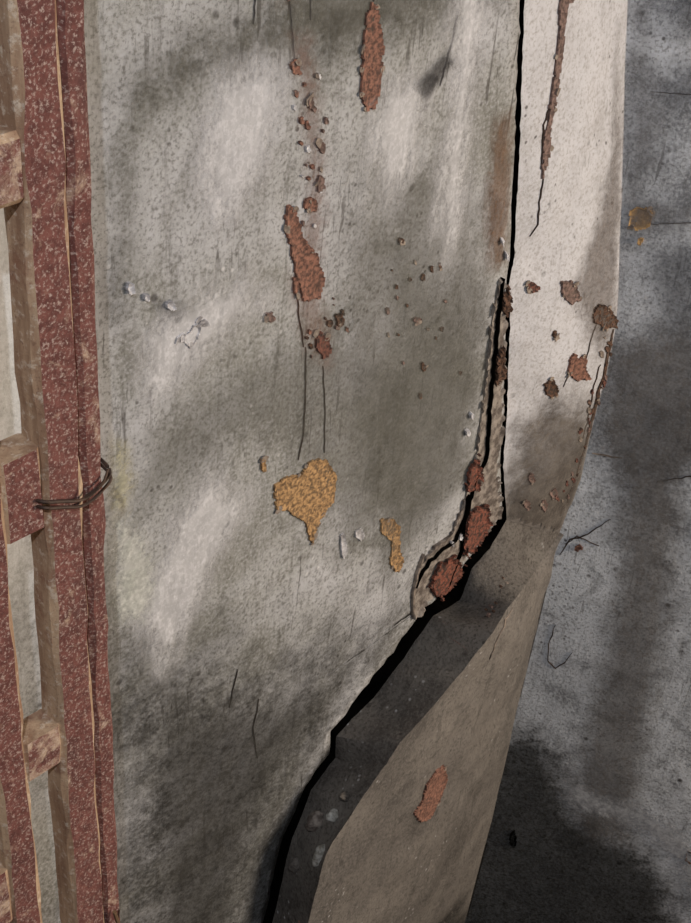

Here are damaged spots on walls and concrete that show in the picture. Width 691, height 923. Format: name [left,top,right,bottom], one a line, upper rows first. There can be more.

crack [289,0,311,59]
crack [439,0,460,86]
crack [530,109,549,236]
crack [297,299,326,460]
crack [411,237,513,620]
leakage [113,486,239,664]
leakage [339,527,365,559]
leakage [441,252,691,923]
leakage [113,636,370,923]